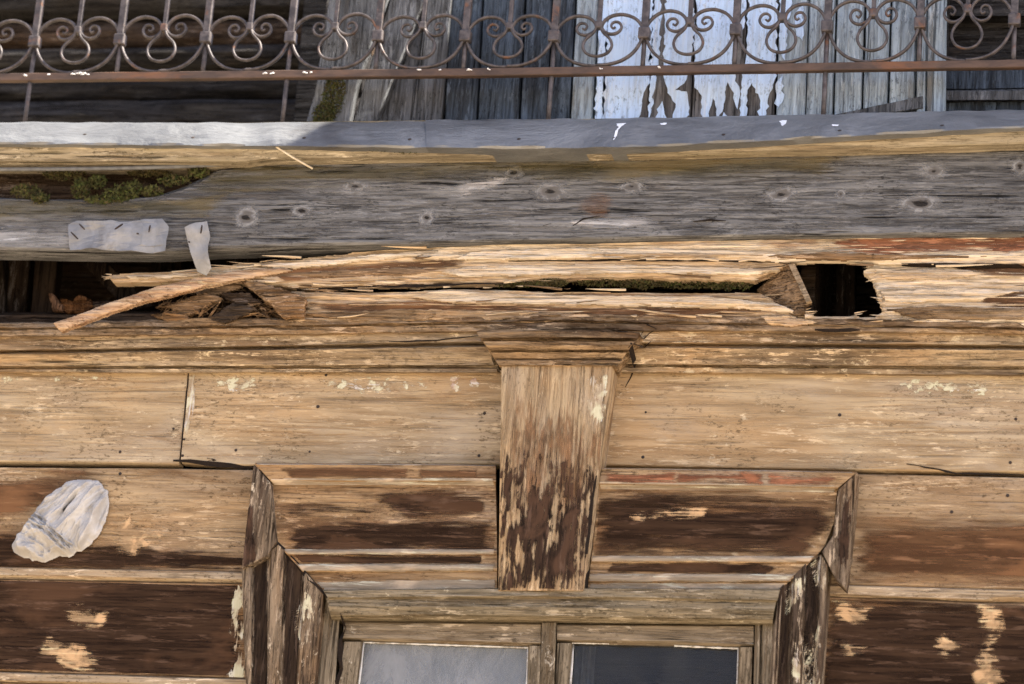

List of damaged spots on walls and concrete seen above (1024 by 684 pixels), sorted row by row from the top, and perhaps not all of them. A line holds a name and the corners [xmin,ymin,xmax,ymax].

peeling [593,0,804,119]
crack [297,259,800,292]
crack [603,324,657,387]
leakage [0,504,267,684]
leakage [282,406,1024,684]